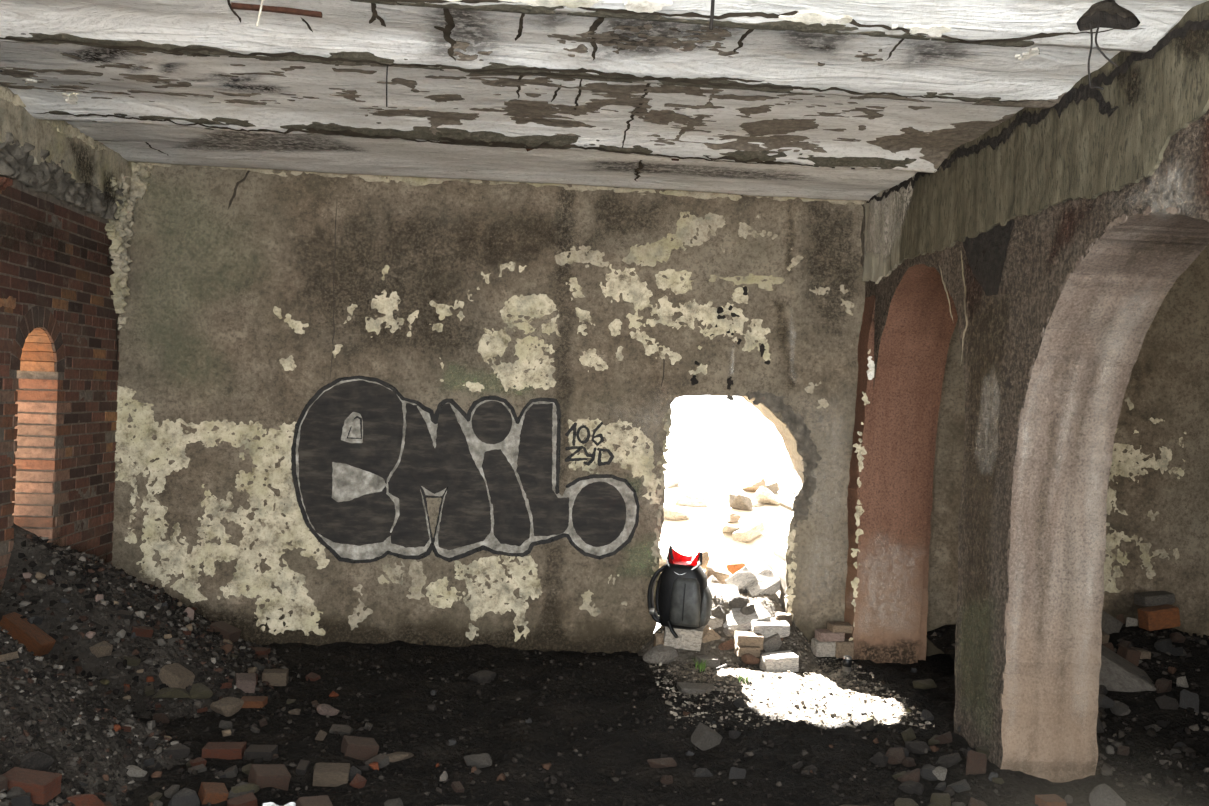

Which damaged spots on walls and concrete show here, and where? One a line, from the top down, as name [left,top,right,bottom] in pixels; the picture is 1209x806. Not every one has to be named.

peeling [0,0,1209,392]
peeling [114,386,330,636]
peeling [1104,428,1186,593]